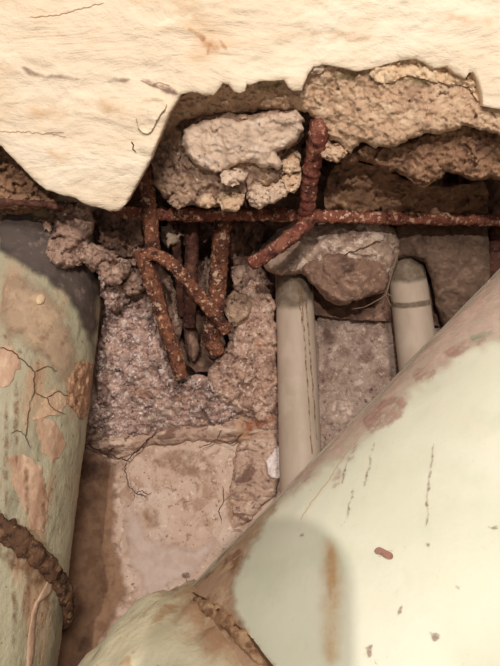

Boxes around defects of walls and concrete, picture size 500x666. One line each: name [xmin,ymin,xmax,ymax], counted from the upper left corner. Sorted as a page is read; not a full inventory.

spalling [0,59,500,532]
crack [0,347,68,446]
crack [85,432,158,498]
crack [200,430,243,448]
rust [192,504,276,666]